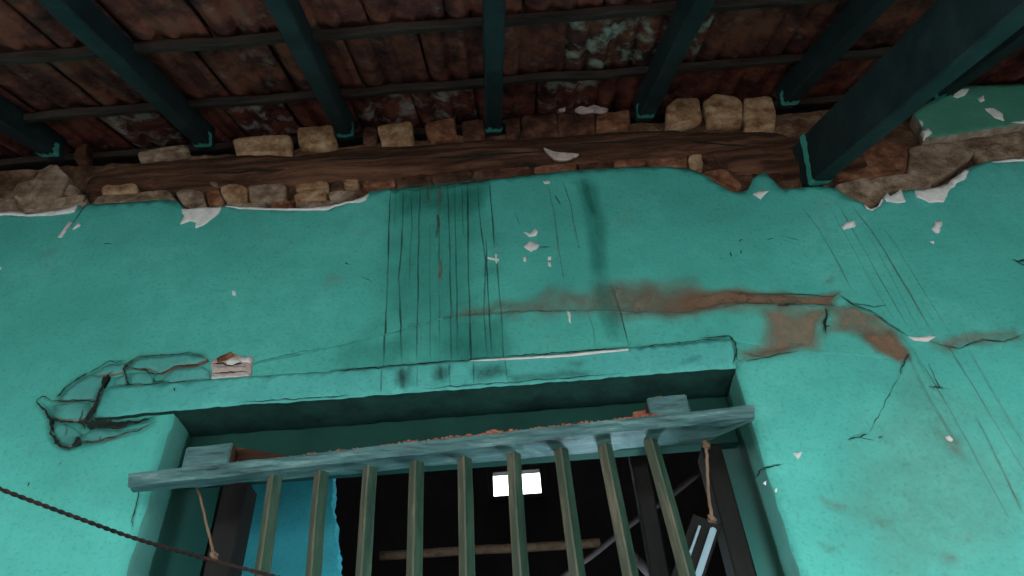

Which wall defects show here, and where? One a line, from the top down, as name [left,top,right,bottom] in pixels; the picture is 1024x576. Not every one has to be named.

peeling [953,89,1024,124]
peeling [919,119,932,141]
peeling [864,169,969,211]
peeling [180,194,369,228]
peeling [523,229,539,262]
crack [716,292,1024,440]
flaking render [36,352,253,449]